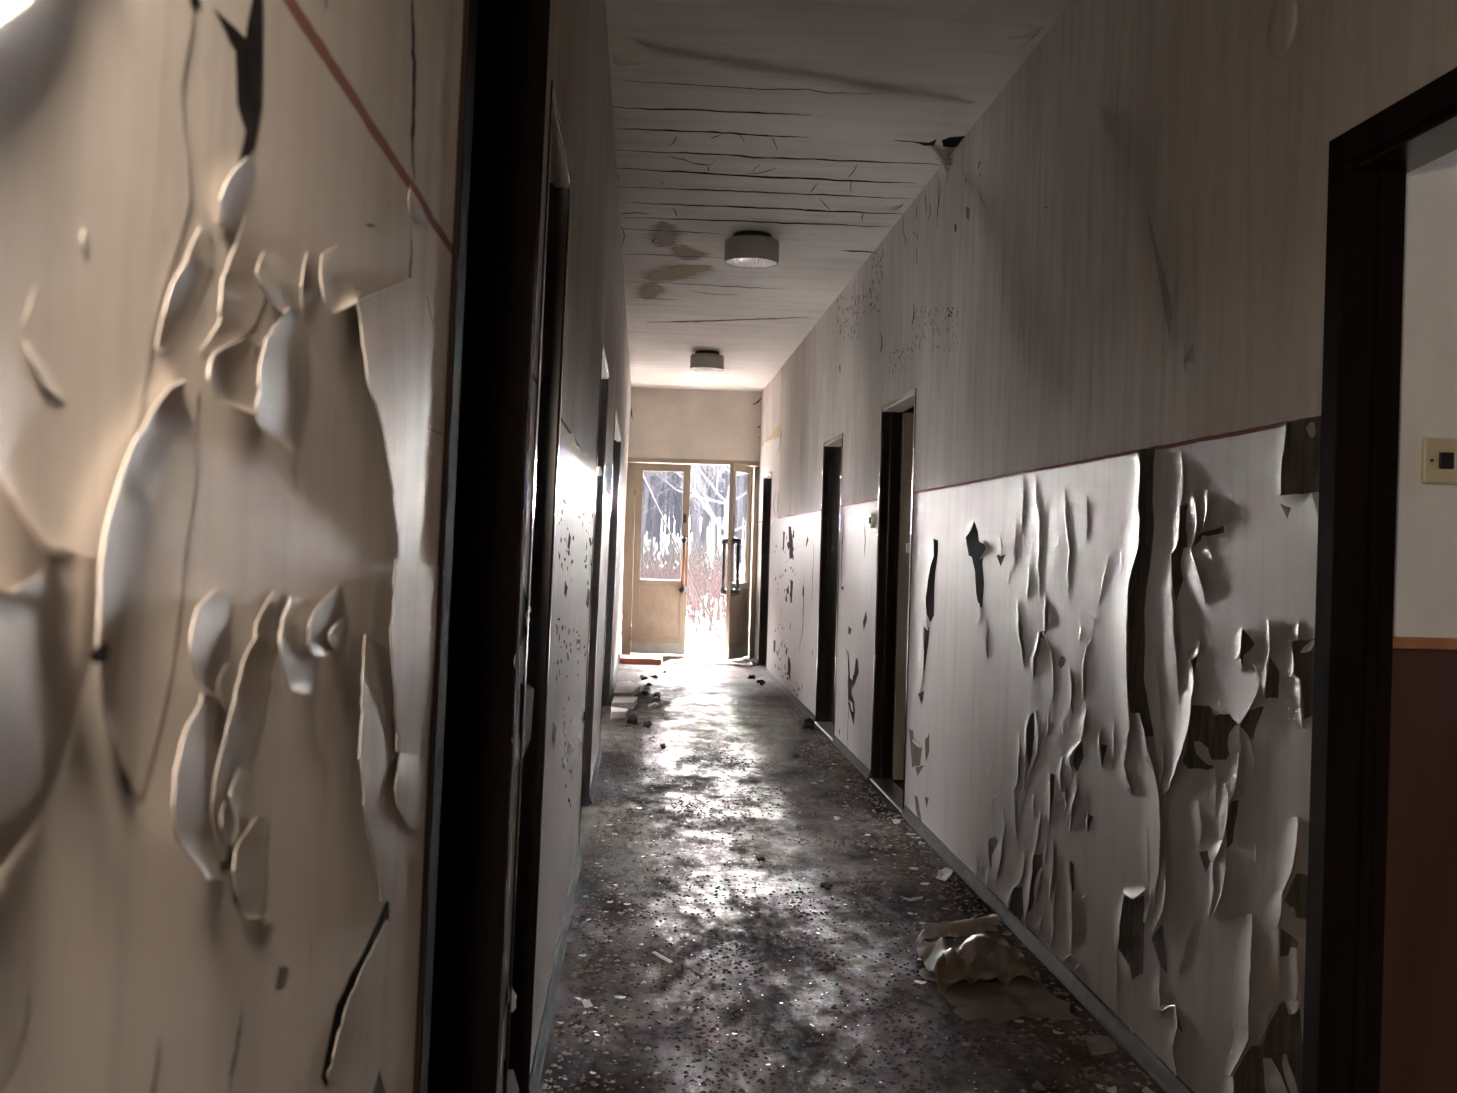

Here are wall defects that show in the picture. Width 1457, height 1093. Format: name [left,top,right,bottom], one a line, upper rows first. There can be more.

peeling [0,0,444,1089]
peeling [512,586,534,764]
peeling [554,618,587,681]
peeling [559,425,602,608]
peeling [773,527,814,697]
peeling [846,613,867,726]
peeling [917,539,938,704]
peeling [1268,416,1321,542]
peeling [892,729,929,824]
peeling [963,447,1315,1093]
peeling [503,970,517,1021]
peeling [503,1059,519,1093]